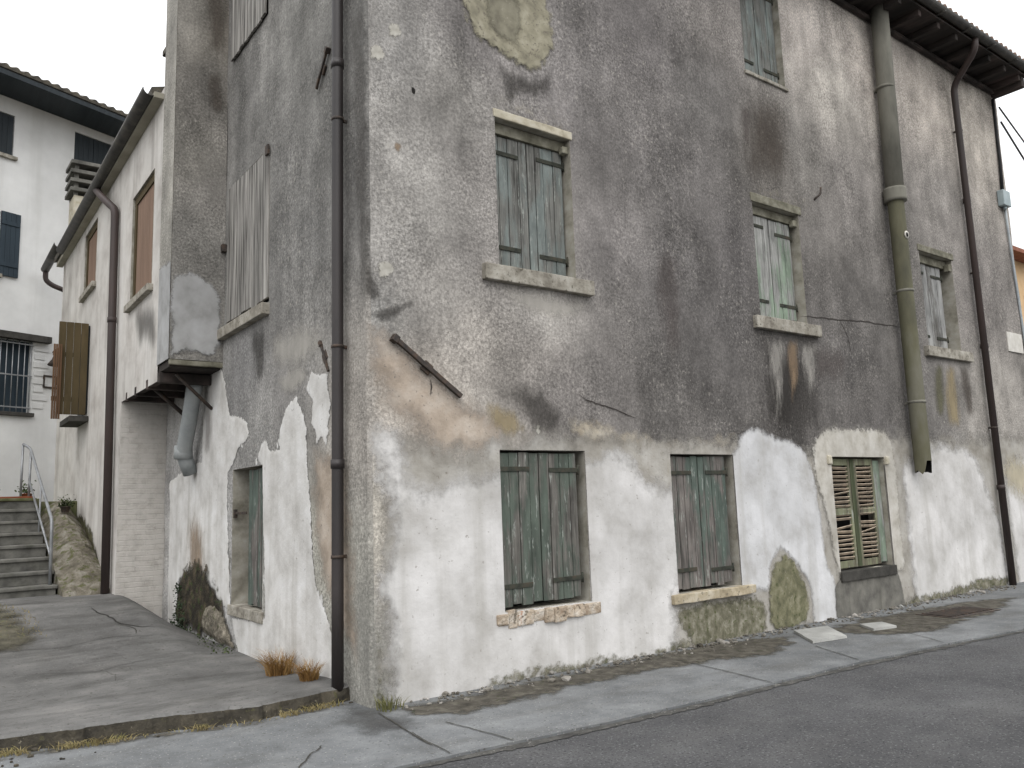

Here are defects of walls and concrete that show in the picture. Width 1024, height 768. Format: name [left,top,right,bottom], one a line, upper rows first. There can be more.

spalling [463,0,554,72]
damp [789,344,797,384]
crack [804,316,897,354]
peeling [373,337,742,581]
peeling [806,451,840,591]
peeling [878,430,916,604]
peeling [930,432,1024,583]
mould [175,559,228,638]
flaking render [201,606,237,649]
damp [645,595,767,655]
peeling [673,547,814,648]
damp [490,655,621,686]